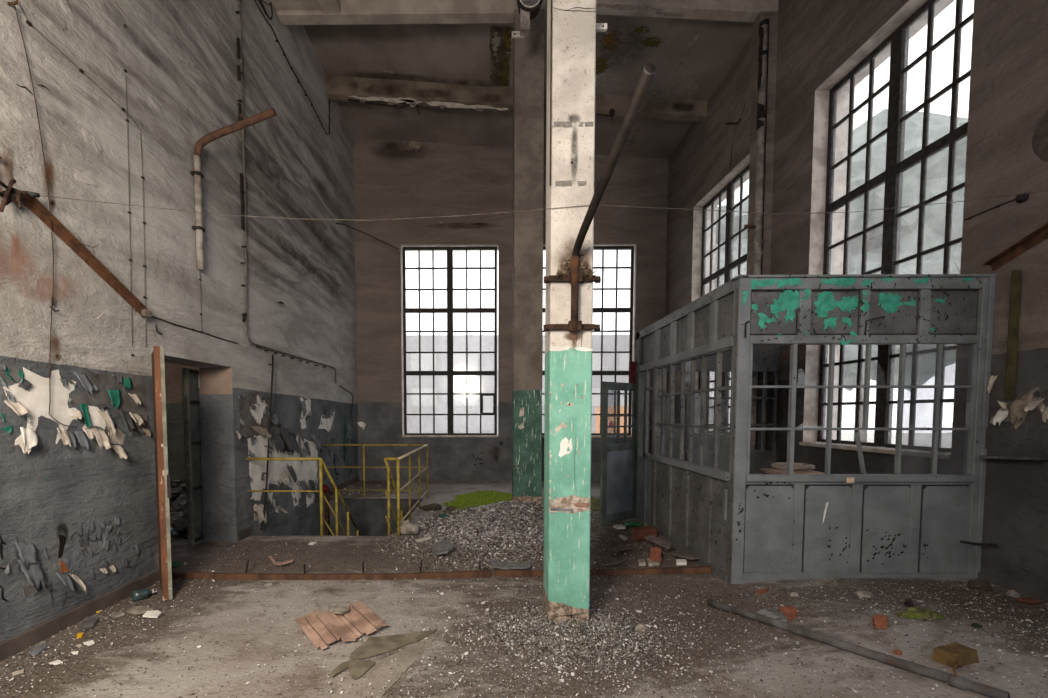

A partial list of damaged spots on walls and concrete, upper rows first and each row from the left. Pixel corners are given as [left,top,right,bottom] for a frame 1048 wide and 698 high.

leakage [595,33,636,83]
spalling [348,96,508,112]
peeling [0,364,152,459]
peeling [986,375,1048,430]
peeling [235,391,423,545]
peeling [549,422,581,465]
spalling [548,480,590,514]
spalling [56,525,89,593]